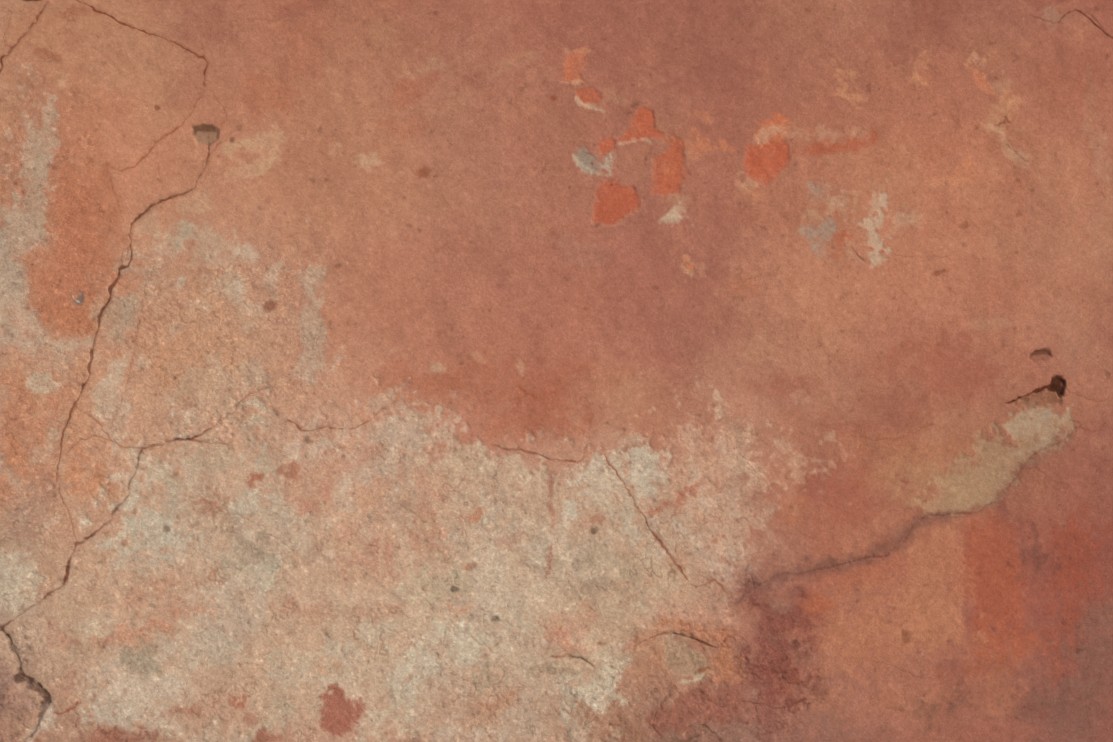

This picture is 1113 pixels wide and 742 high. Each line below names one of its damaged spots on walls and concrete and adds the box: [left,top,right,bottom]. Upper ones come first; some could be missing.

peeling [546,44,606,115]
crack [994,7,1113,45]
leakage [0,87,78,358]
peeling [570,104,792,229]
peeling [840,167,926,277]
crack [0,0,398,742]
leakage [280,262,344,396]
leakage [539,216,739,387]
spalling [1028,346,1054,365]
leakage [0,507,52,632]
crack [489,375,1112,652]
spalling [881,373,1080,523]